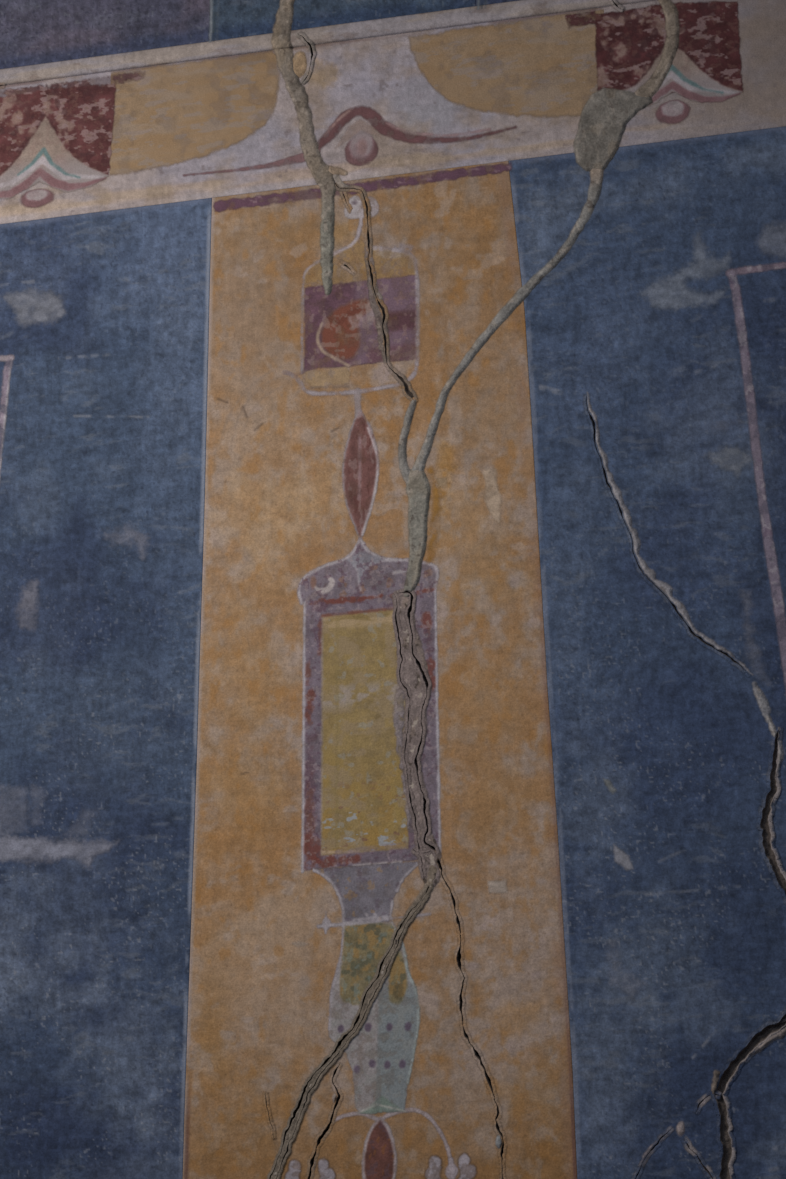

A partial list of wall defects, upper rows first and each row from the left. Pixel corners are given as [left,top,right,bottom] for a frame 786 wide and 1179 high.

crack [635,0,679,97]
crack [263,0,603,1179]
crack [583,394,786,905]
crack [632,1006,786,1179]